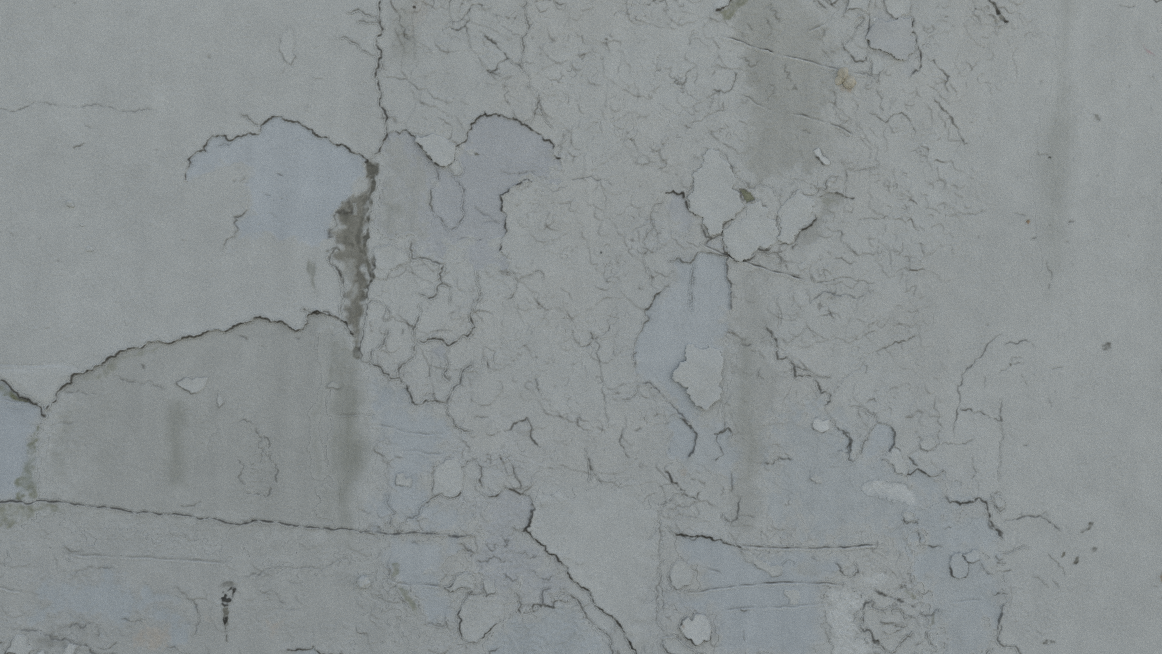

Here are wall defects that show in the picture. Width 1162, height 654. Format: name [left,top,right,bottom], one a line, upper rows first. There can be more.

crack [339,0,448,141]
crack [445,0,614,187]
crack [643,0,738,115]
crack [868,88,917,136]
crack [408,239,573,306]
crack [739,163,893,380]
crack [460,414,544,490]
peeling [0,110,1013,654]
crack [573,330,643,459]
crack [720,497,756,524]
crack [857,330,918,404]
crack [926,333,1066,590]